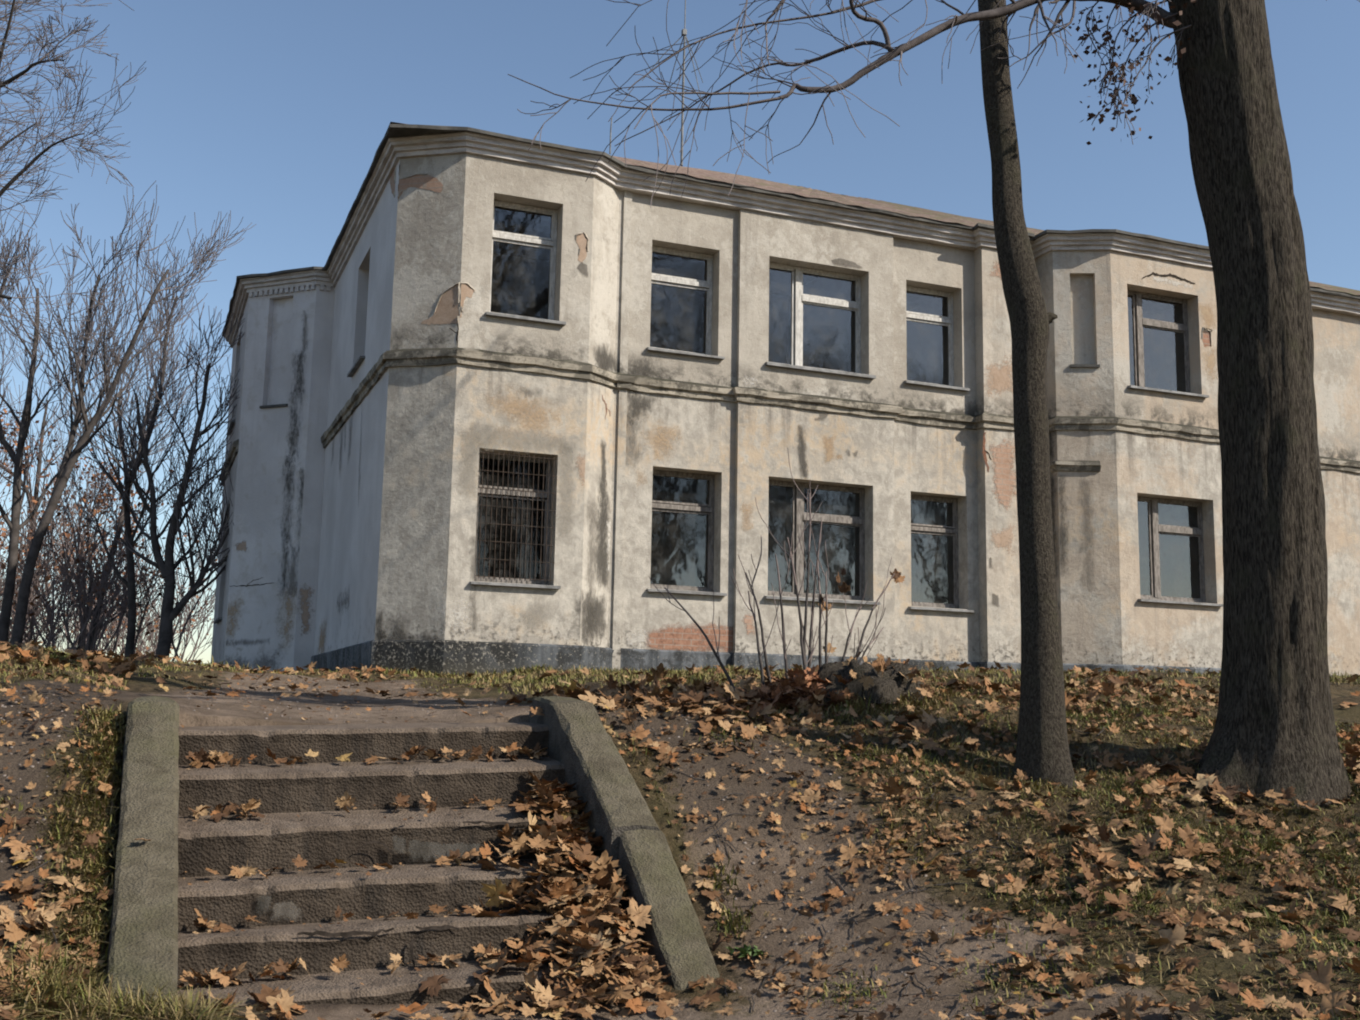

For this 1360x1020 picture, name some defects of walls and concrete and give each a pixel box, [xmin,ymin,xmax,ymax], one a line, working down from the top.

flaking render [390,164,443,198]
peeling [421,282,476,325]
peeling [574,232,589,276]
damp [281,410,304,594]
damp [577,444,611,643]
peeling [990,439,1016,567]
damp [1049,431,1082,572]
flaking render [630,615,756,651]